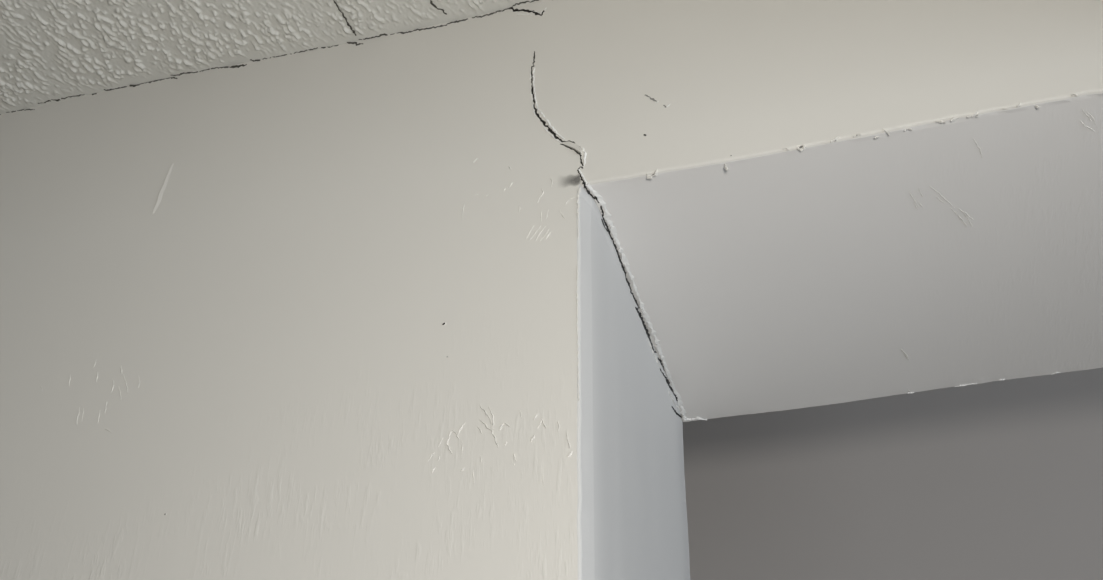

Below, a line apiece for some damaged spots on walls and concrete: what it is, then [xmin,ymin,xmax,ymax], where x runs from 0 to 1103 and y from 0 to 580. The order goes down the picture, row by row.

crack [0,0,546,115]
crack [529,51,687,419]